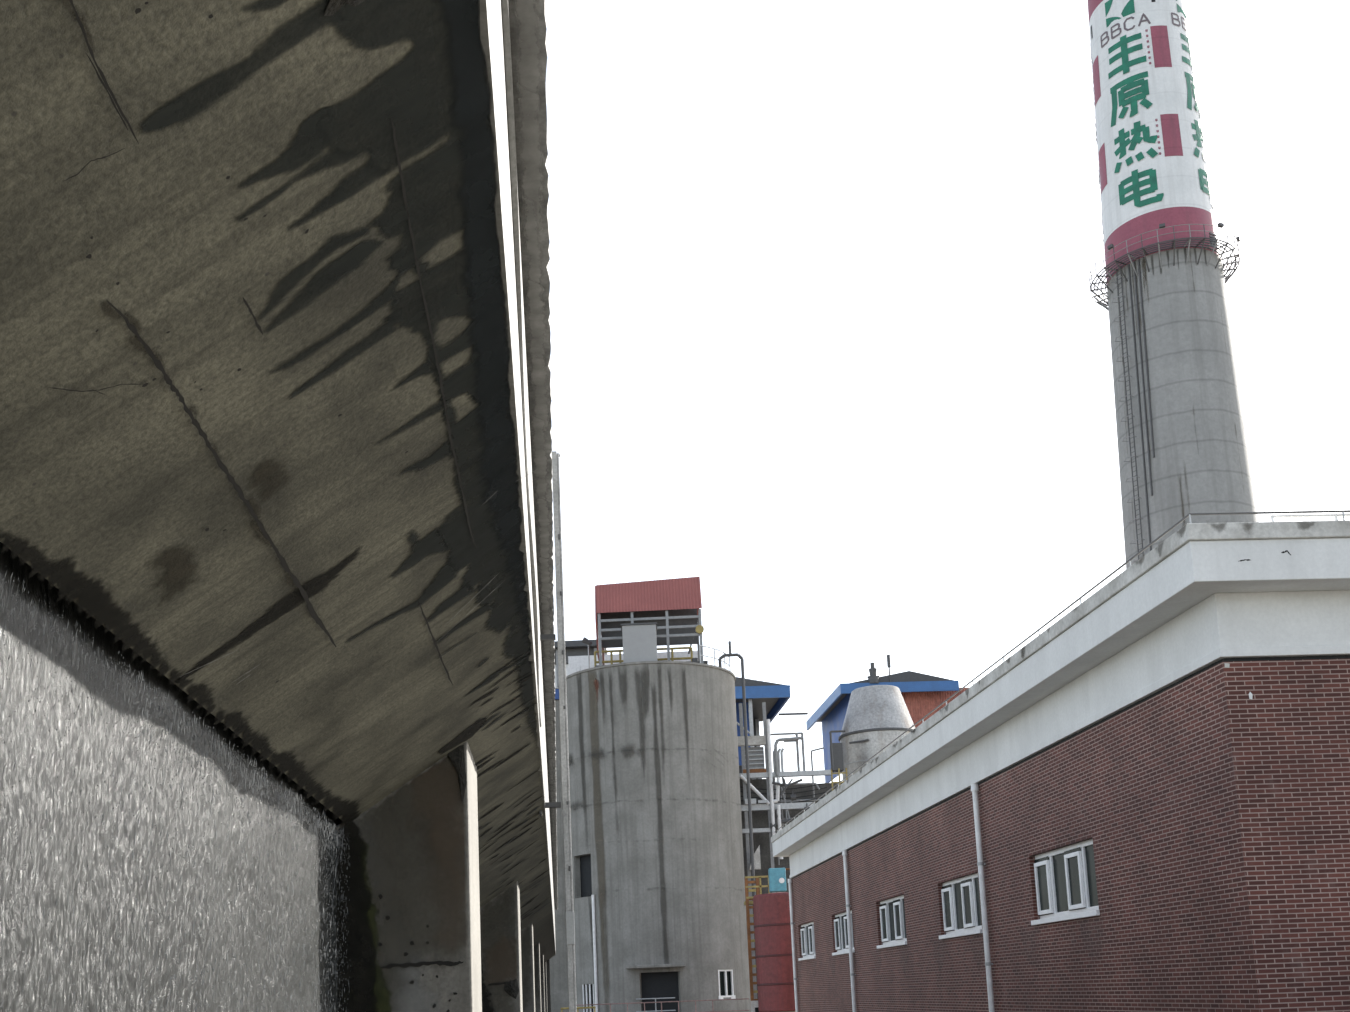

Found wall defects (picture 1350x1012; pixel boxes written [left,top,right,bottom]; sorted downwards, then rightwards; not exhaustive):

crack [62,0,139,181]
crack [48,297,337,647]
damp [0,0,549,1012]
damp [569,670,688,973]